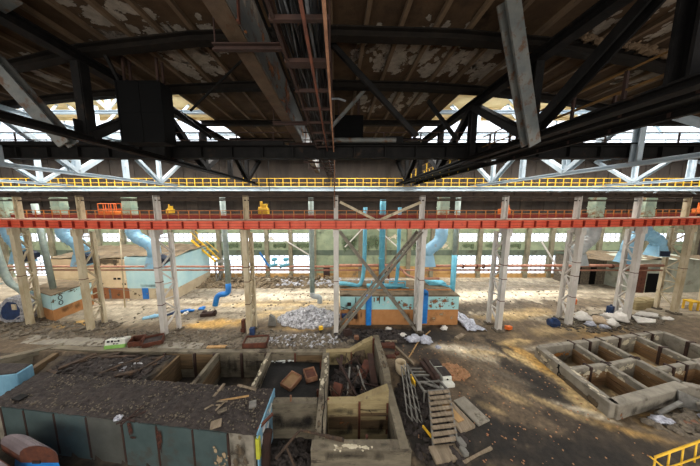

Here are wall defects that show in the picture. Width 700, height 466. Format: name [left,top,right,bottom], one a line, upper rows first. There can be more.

peeling [55,0,186,39]
peeling [194,13,213,30]
peeling [577,10,623,46]
spalling [621,21,673,60]
peeling [157,47,229,83]
peeling [350,43,507,83]
peeling [355,92,430,113]
spalling [213,436,248,466]